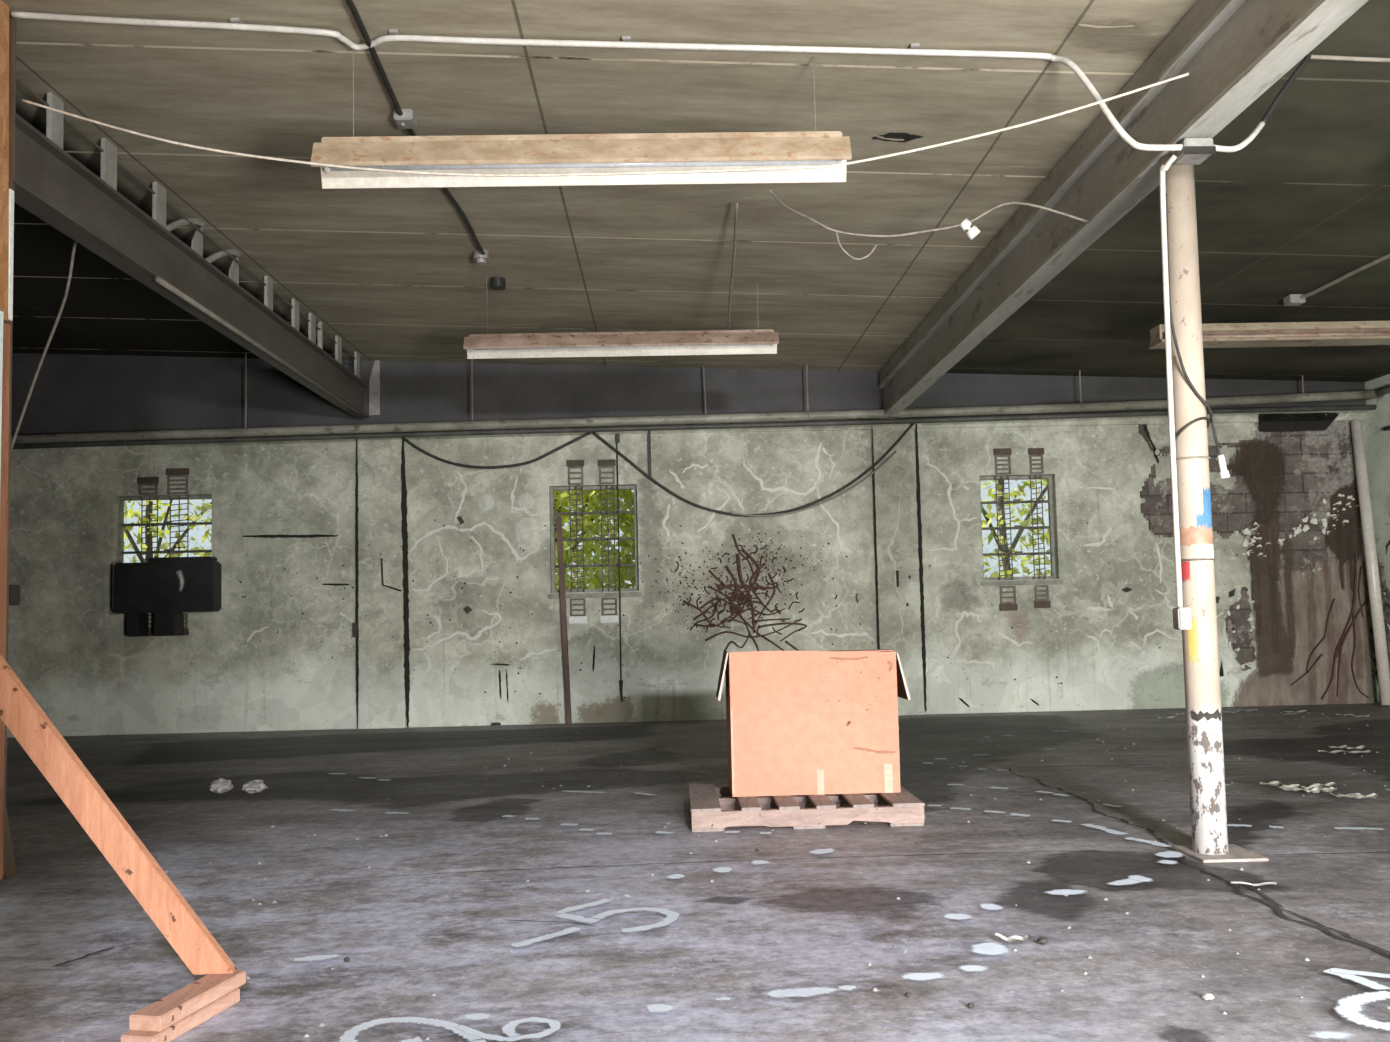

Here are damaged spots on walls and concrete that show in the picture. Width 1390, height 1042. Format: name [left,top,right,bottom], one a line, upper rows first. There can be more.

crack [401,439,559,727]
crack [662,423,1039,711]
crack [1083,525,1115,547]
crack [1085,484,1115,492]
crack [1086,542,1182,683]
crack [1138,424,1159,463]
peeling [1140,446,1174,539]
leakage [1229,440,1295,676]
peeling [1208,413,1359,671]
leakage [1325,483,1361,590]
leakage [996,882,1093,918]
crack [1009,763,1390,957]